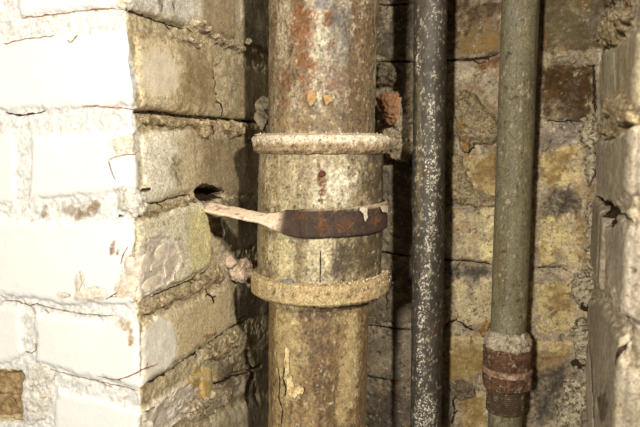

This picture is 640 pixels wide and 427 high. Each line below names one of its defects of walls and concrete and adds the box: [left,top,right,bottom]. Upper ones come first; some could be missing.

crack [83,70,249,123]
crack [6,109,45,117]
crack [596,196,638,227]